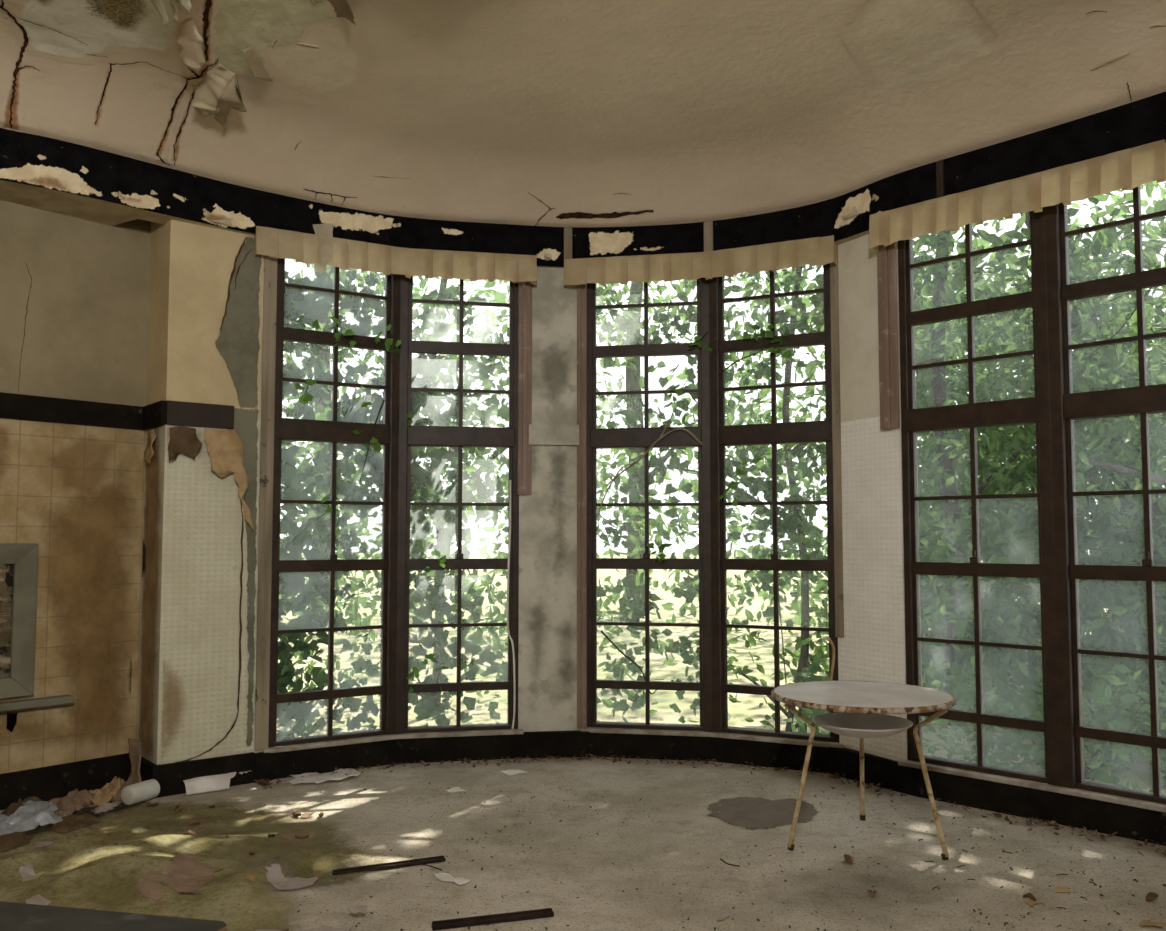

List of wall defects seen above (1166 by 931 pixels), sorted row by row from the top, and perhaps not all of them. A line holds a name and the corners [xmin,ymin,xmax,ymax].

mould [90,0,141,26]
crack [0,0,218,166]
peeling [3,0,247,130]
peeling [0,154,186,209]
peeling [834,189,882,229]
peeling [537,248,561,261]
peeling [589,231,663,255]
peeling [174,203,261,763]
leakage [52,437,160,756]
leakage [0,720,49,739]